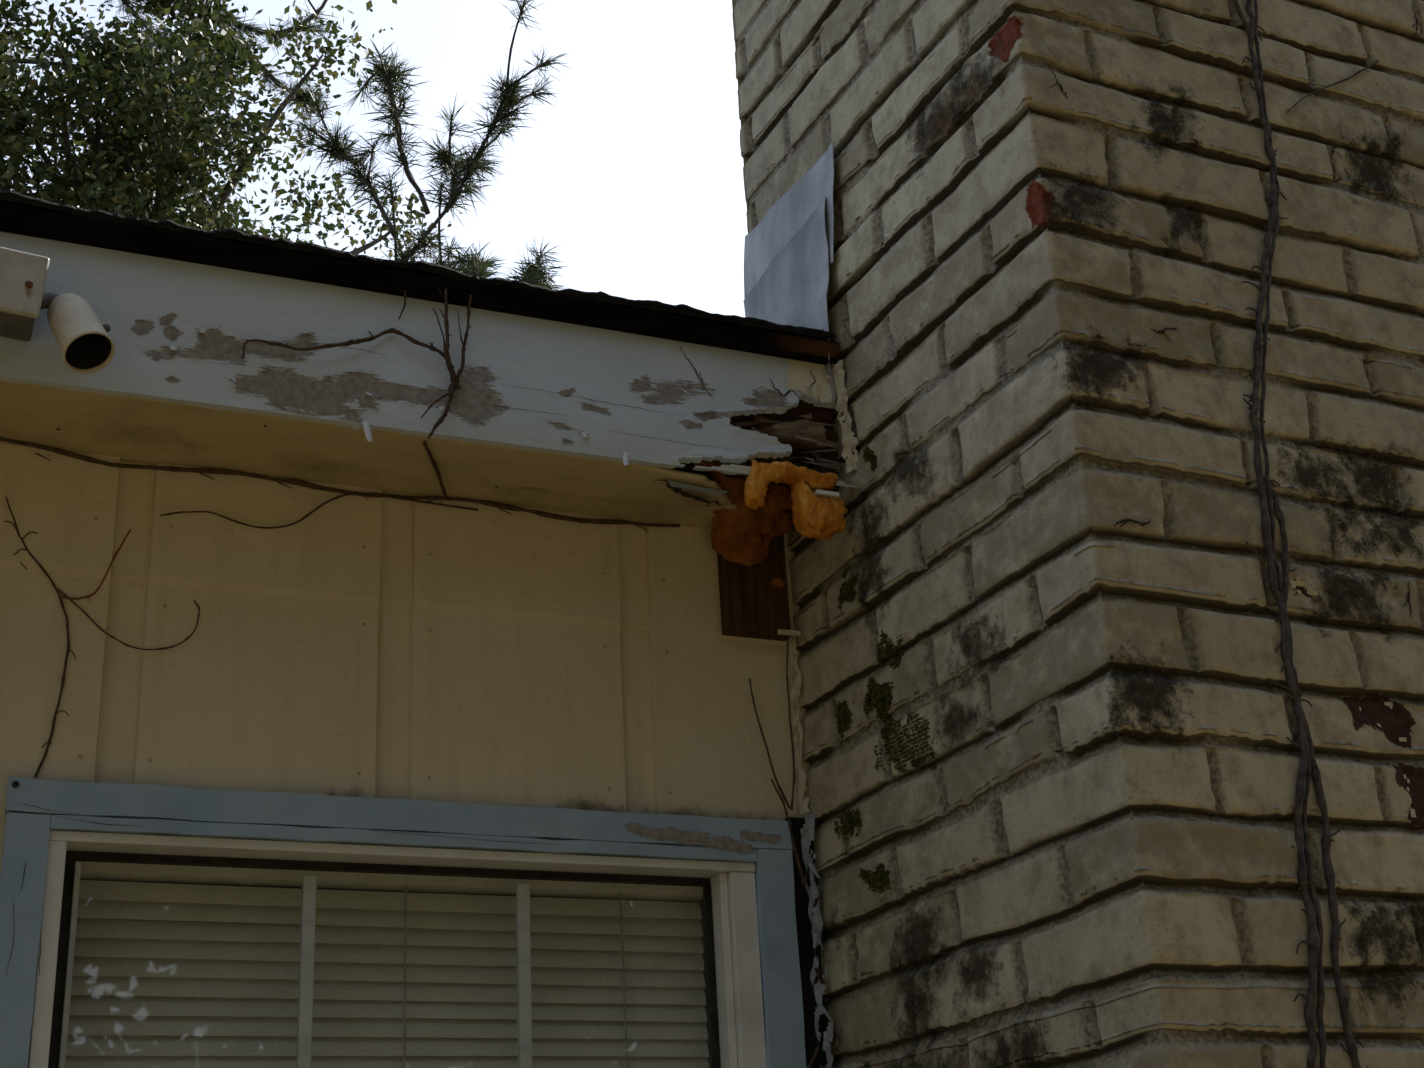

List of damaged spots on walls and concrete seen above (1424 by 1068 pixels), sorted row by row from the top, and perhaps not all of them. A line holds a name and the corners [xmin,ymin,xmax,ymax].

peeling [131,313,511,442]
peeling [628,374,722,429]
peeling [1340,690,1424,828]
peeling [624,823,782,853]